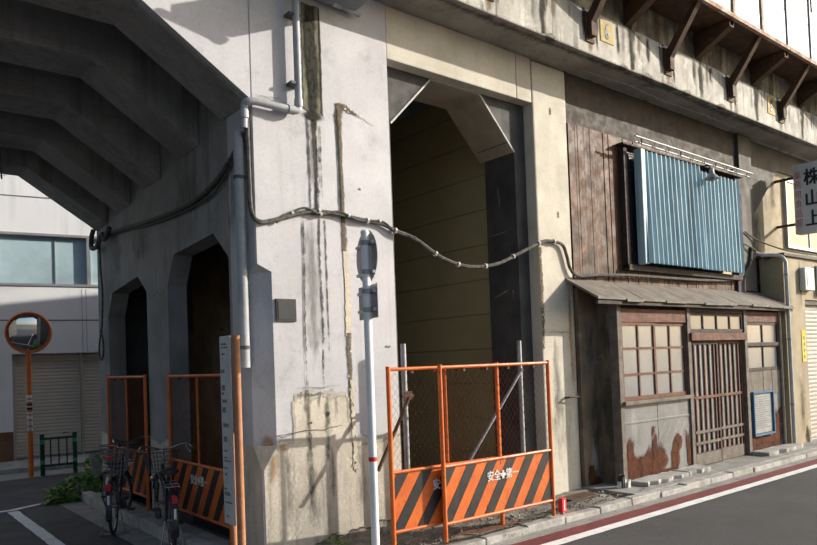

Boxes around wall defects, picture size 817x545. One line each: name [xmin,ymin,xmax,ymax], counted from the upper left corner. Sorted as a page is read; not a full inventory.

water stain [442,0,516,31]
water stain [527,0,773,133]
water stain [301,2,330,378]
peeling [234,103,401,545]
water stain [300,362,337,514]
corrosion [627,426,692,480]
corrosion [752,407,782,451]